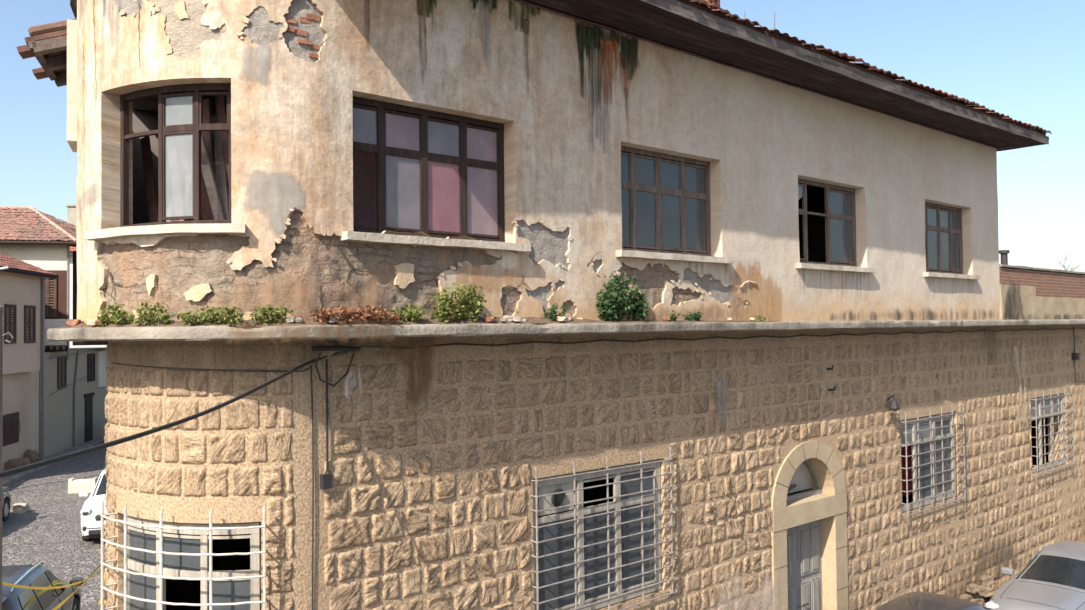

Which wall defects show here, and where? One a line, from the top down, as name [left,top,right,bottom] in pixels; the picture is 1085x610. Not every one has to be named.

peeling [115,0,325,62]
spalling [99,208,501,322]
spalling [500,220,576,316]
spalling [615,263,749,310]